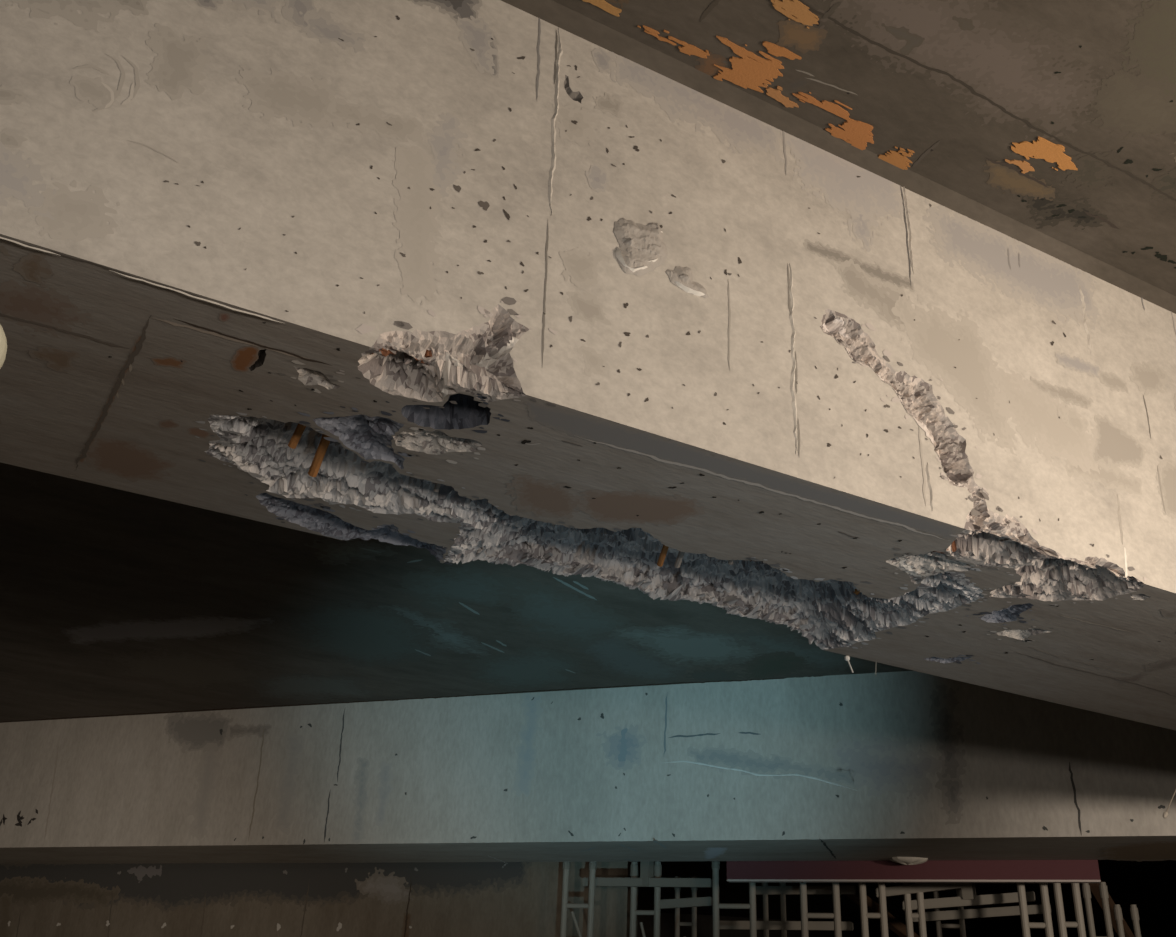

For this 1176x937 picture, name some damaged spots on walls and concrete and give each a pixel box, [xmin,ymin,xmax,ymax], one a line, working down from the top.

peeling [582,0,622,17]
peeling [771,0,819,29]
spalling [564,75,583,103]
peeling [638,25,914,170]
leakage [816,0,1176,141]
leakage [552,48,1148,495]
leakage [1055,352,1176,410]
spalling [195,297,1150,650]
leakage [1156,460,1176,519]
crack [1069,762,1082,836]